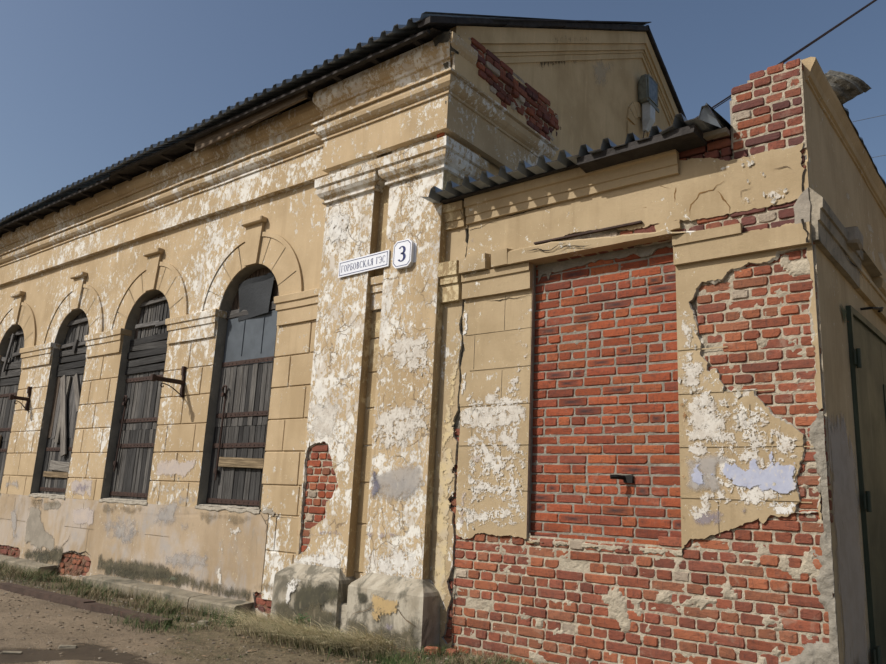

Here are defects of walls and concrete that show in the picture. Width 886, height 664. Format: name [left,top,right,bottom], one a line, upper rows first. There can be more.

spalling [469,37,559,141]
spalling [679,58,807,167]
crack [662,181,747,217]
peeling [392,331,431,376]
peeling [372,397,430,449]
spalling [431,242,840,664]
spalling [294,442,344,569]
crack [444,318,465,643]
spalling [0,545,20,558]
spalling [52,552,91,577]
peeling [365,546,420,578]